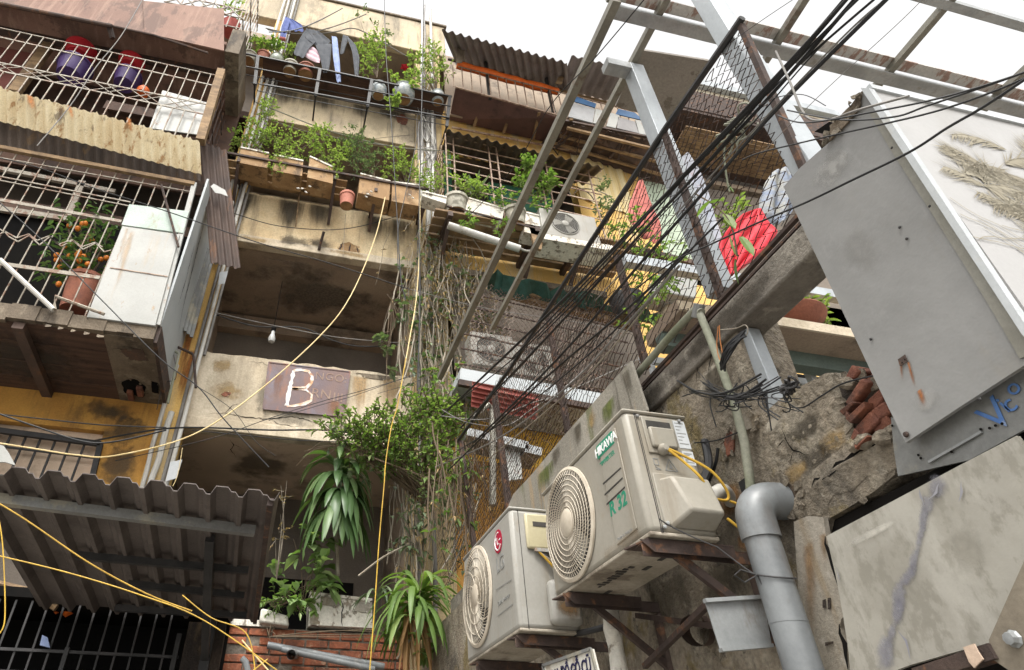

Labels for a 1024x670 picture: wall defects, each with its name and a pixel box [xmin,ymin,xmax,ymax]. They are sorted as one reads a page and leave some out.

leakage [280,200,329,223]
leakage [283,236,327,246]
rust [898,355,923,401]
spalling [832,365,893,453]
leakage [103,453,133,482]
leakage [236,454,283,474]
crack [778,430,876,485]